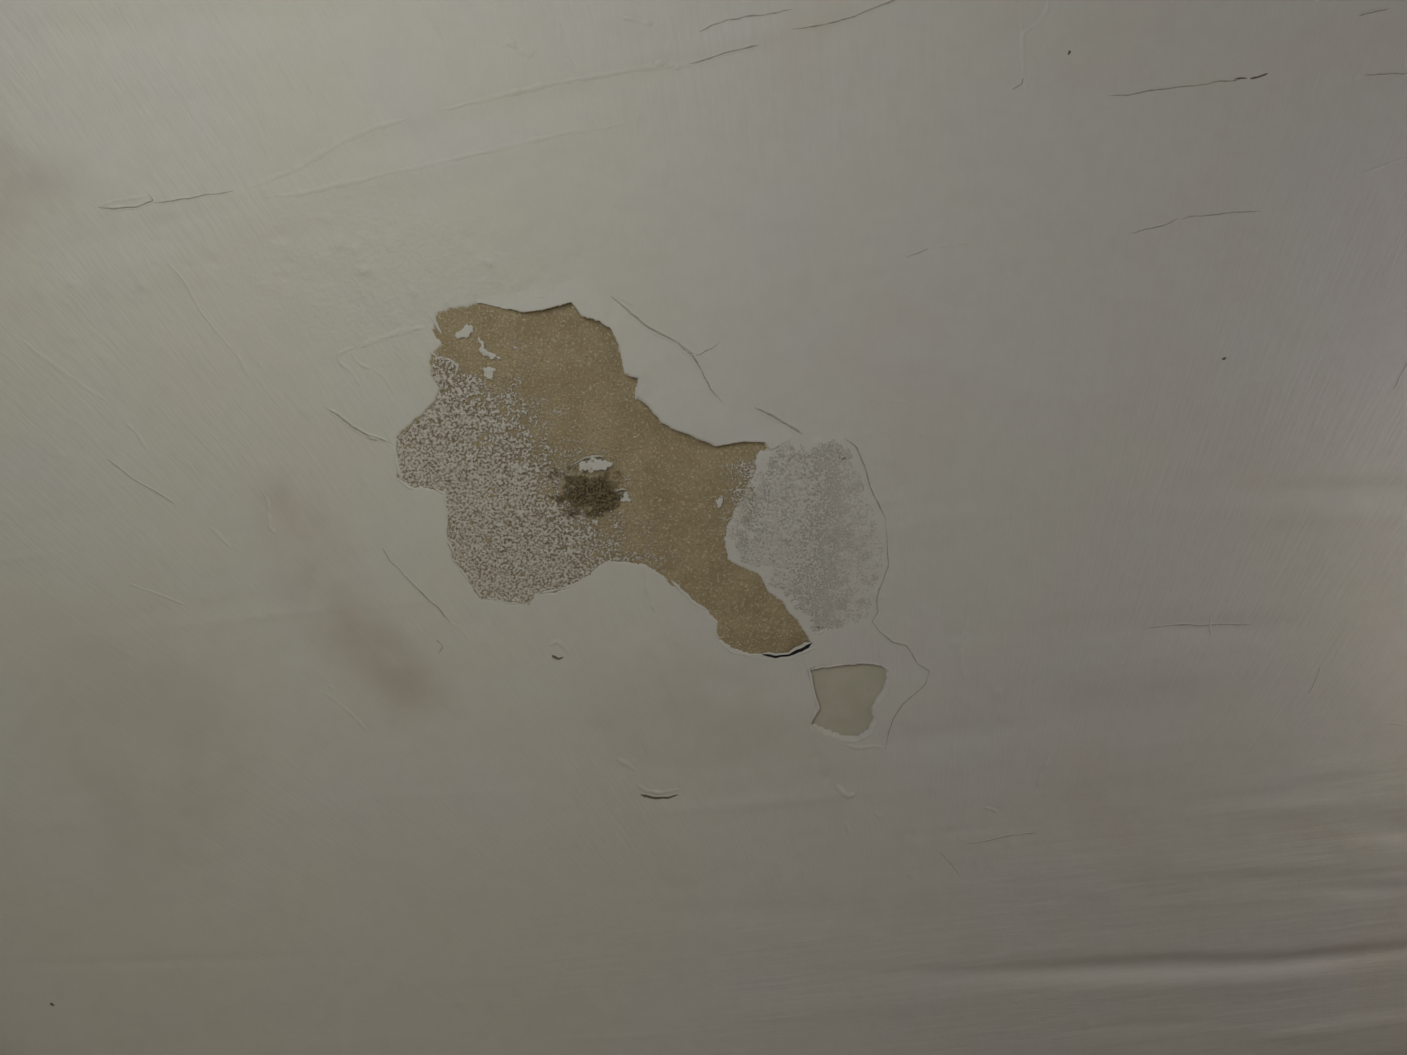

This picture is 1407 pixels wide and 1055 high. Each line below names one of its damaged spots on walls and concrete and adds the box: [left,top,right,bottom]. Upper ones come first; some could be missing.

peeling [325,278,892,743]